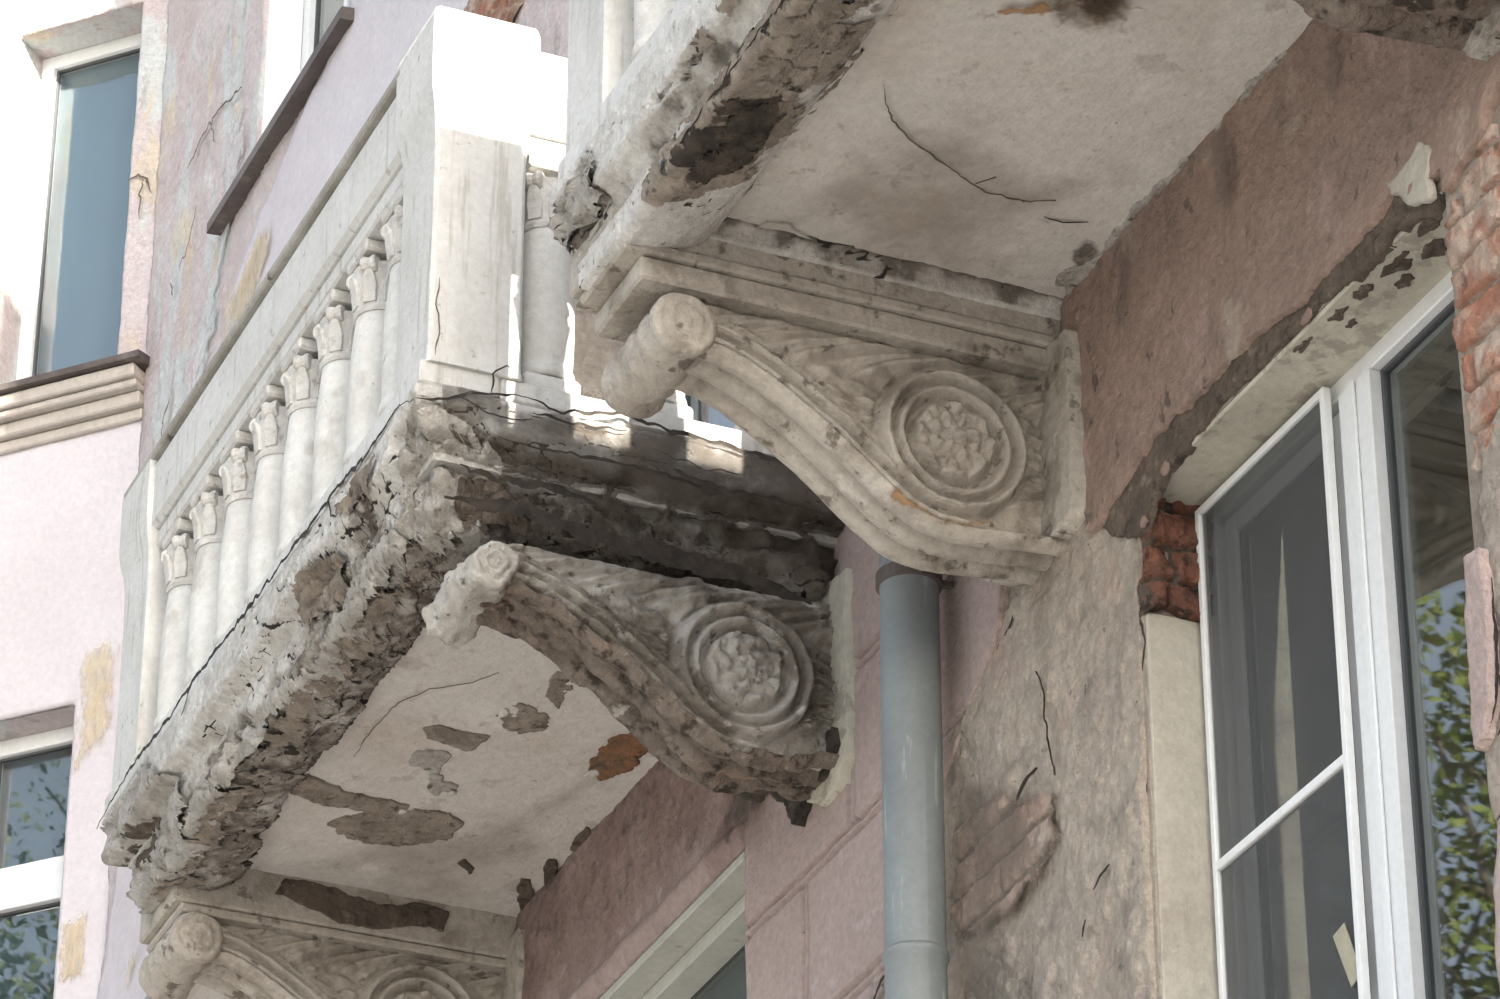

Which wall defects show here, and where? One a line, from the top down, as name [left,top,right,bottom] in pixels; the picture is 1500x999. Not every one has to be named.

peeling [224,110,244,193]
flaking render [464,0,525,23]
peeling [547,156,608,253]
spalling [632,0,898,207]
crack [883,85,1087,223]
flaking render [1240,51,1287,101]
peeling [192,223,269,389]
flaking render [943,123,1500,999]
spalling [100,395,573,914]
flaking render [583,733,648,781]
crack [1015,671,1056,801]
flaking render [516,826,591,911]